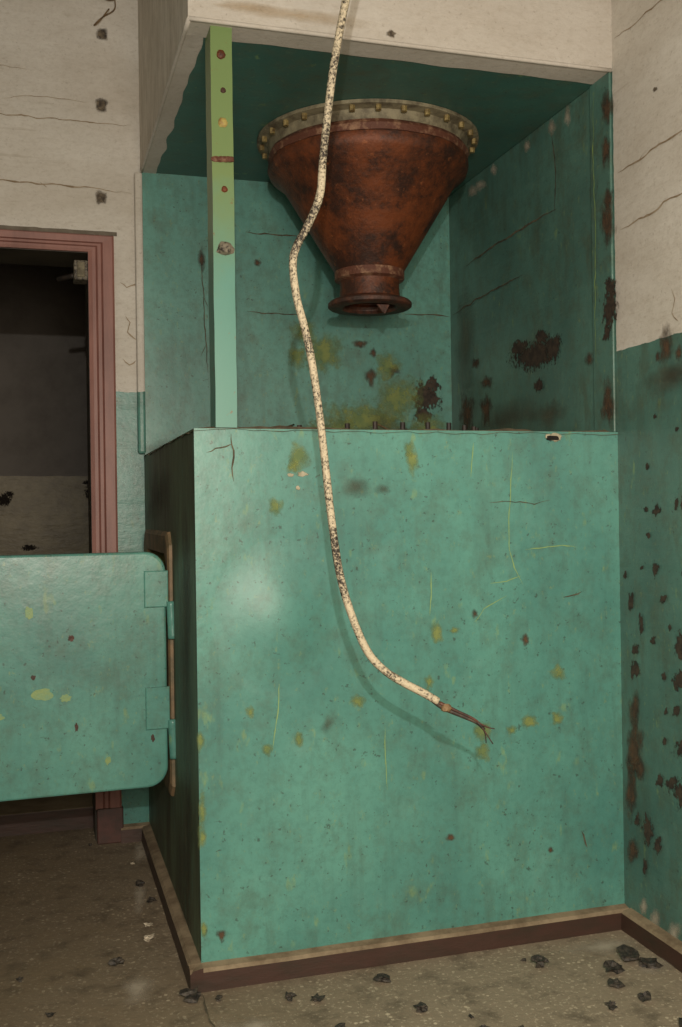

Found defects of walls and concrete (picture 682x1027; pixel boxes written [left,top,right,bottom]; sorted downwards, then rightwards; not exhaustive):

crack [615,0,662,38]
crack [0,95,126,126]
rust [602,93,613,121]
crack [0,179,131,194]
rust [602,190,612,242]
rust [602,277,619,341]
rust [656,331,681,360]
rust [603,387,613,419]
rust [626,696,644,812]